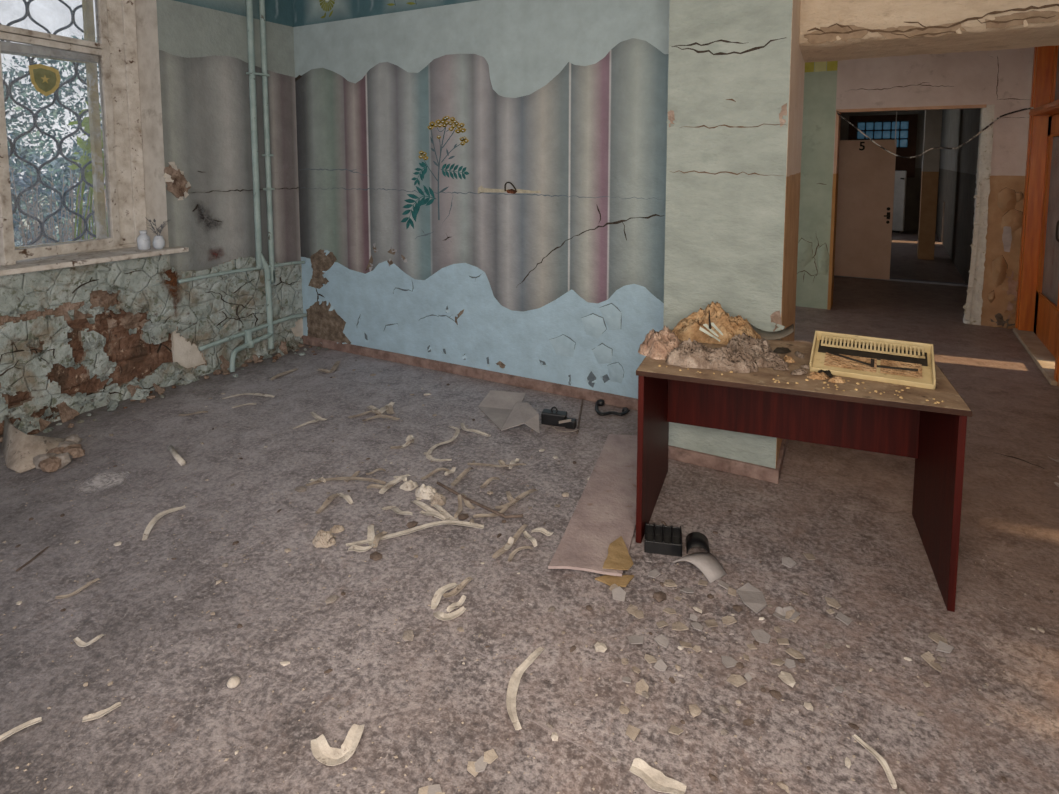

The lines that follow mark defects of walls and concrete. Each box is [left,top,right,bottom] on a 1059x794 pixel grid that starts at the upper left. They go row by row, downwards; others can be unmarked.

flaking render [306,249,351,344]
flaking render [0,286,200,435]
peeling [206,341,288,372]